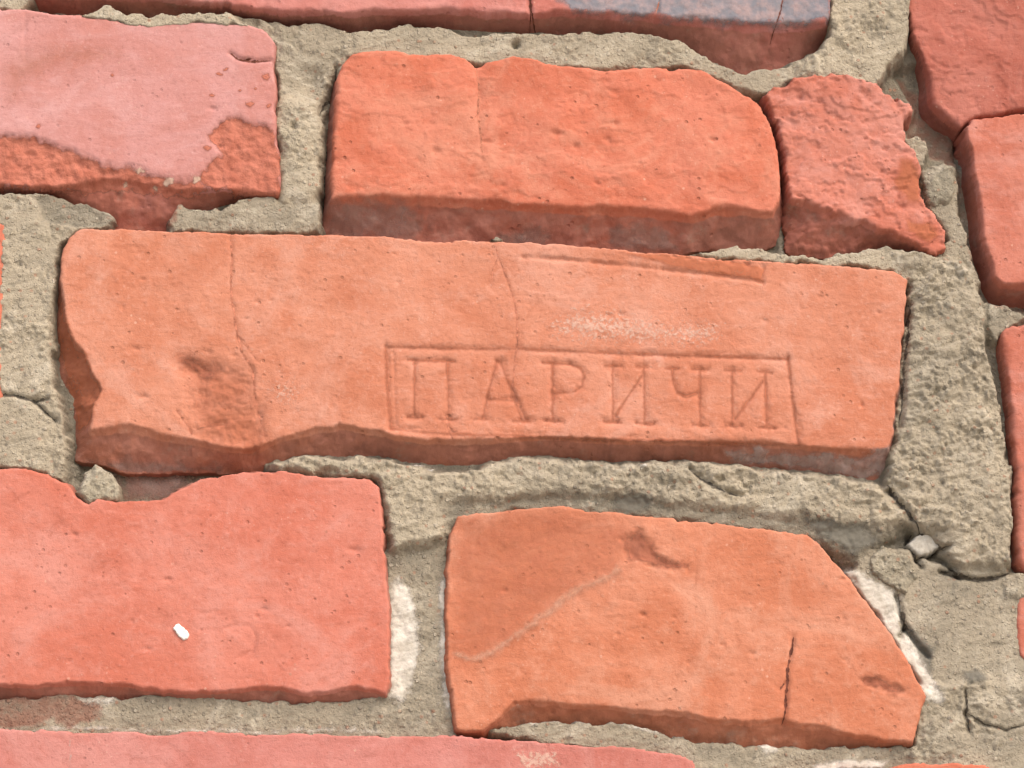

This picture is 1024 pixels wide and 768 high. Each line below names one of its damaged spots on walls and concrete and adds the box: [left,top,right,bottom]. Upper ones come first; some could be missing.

spalling [0,118,281,200]
water stain [389,578,419,701]
water stain [439,581,512,707]
crack [780,637,794,724]
water stain [843,567,944,702]